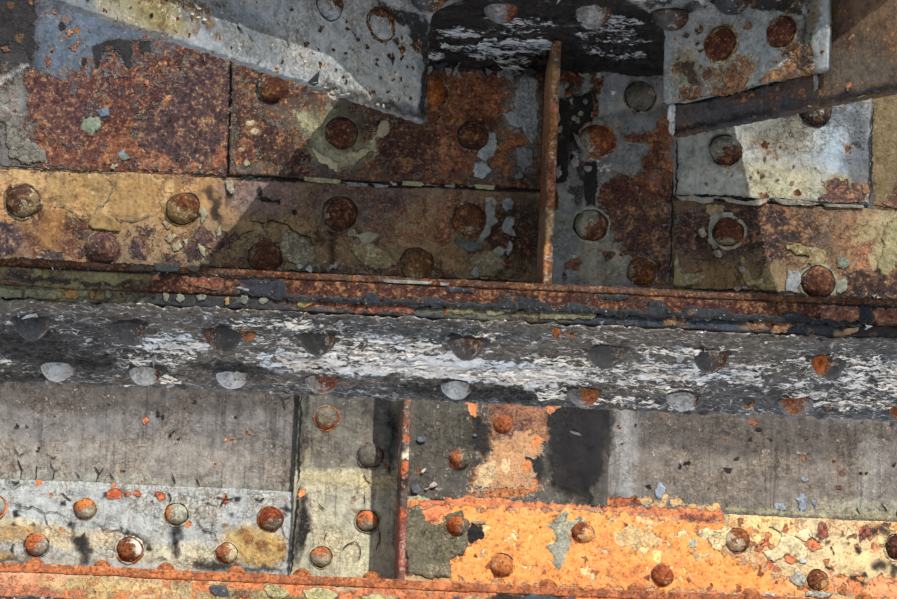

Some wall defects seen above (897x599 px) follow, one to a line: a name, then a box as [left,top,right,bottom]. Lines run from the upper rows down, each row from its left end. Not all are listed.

corrosion [19,50,319,261]
peeling [308,68,350,100]
peeling [428,62,540,180]
peeling [667,96,713,135]
peeling [153,220,212,272]
corrosion [151,225,233,281]
peeling [225,132,881,360]
corrosion [597,131,700,285]
corrosion [819,239,897,324]
peeling [405,482,485,579]
corrosion [420,402,806,599]
corrosion [805,521,830,567]